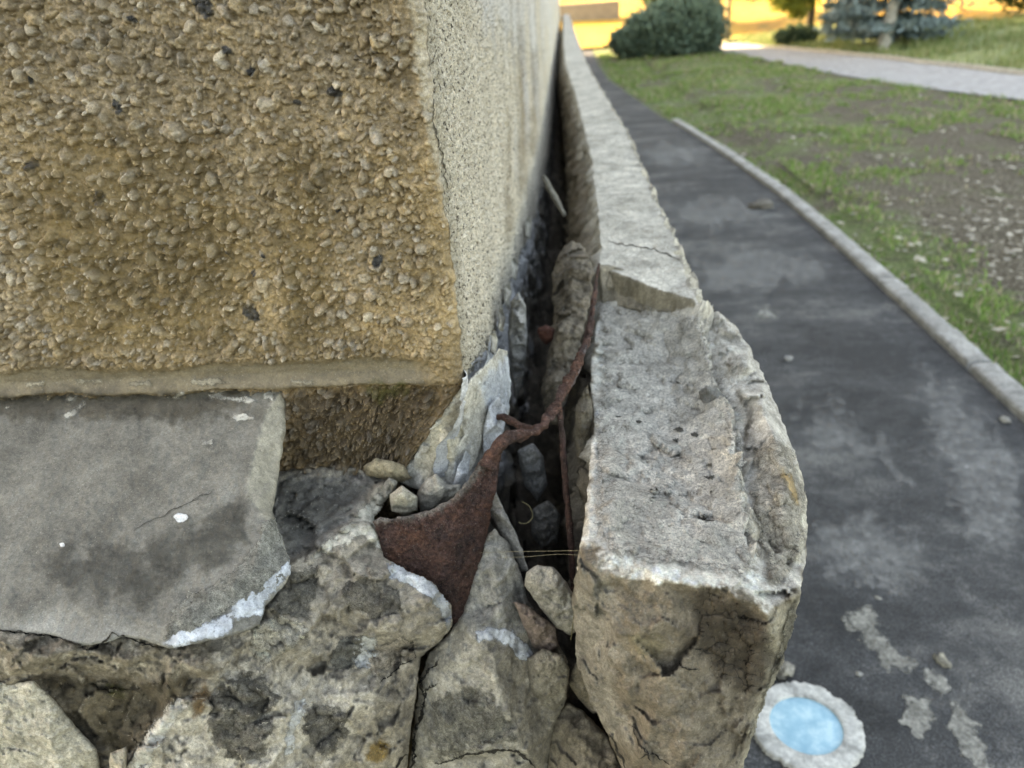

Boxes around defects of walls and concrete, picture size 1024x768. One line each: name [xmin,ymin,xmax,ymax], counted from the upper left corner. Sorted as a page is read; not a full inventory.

crack [432,99,448,188]
crack [607,240,678,259]
peeling [402,256,518,490]
water stain [44,505,246,607]
spalling [314,492,387,558]
spalling [367,637,417,674]
crack [381,641,535,768]
spalling [427,687,518,760]
crack [609,725,669,768]